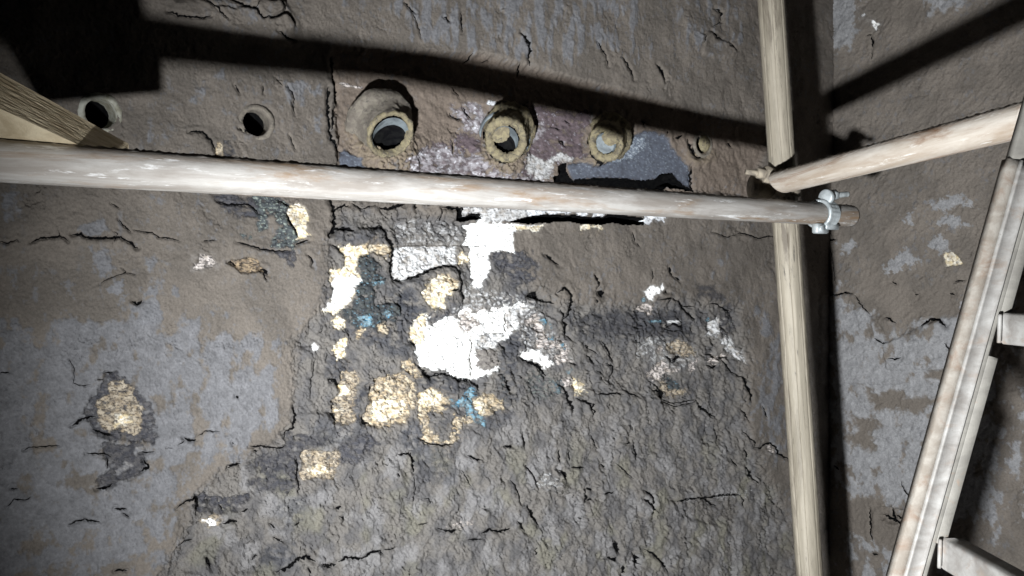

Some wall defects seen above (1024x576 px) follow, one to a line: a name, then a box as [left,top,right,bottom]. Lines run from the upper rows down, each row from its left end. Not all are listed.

crack [517,33,532,76]
crack [598,43,634,79]
spalling [567,131,690,188]
crack [1,204,179,283]
spalling [286,204,311,240]
spalling [321,207,605,444]
spalling [635,285,664,315]
spalling [645,317,746,398]
crack [830,230,949,360]
spalling [95,380,145,486]
crack [385,255,788,555]
crack [607,541,668,573]